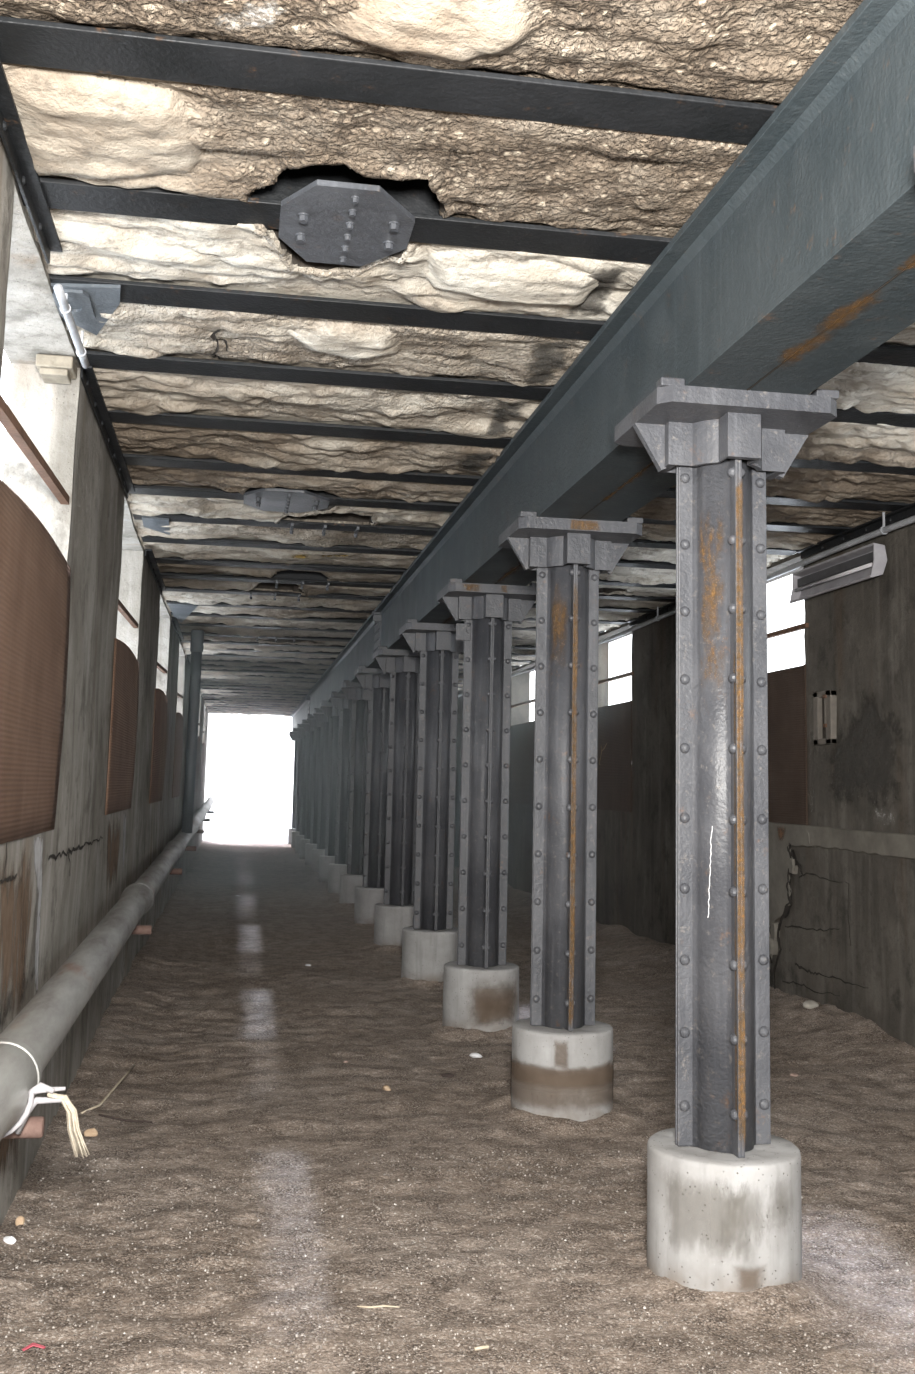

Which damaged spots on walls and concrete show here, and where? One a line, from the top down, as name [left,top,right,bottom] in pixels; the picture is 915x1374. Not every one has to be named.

spalling [231,155,460,218]
spalling [254,224,425,278]
rust [552,598,578,1021]
rust [701,485,745,1137]
crack [0,841,17,884]
crack [48,836,103,861]
peeling [769,822,915,988]